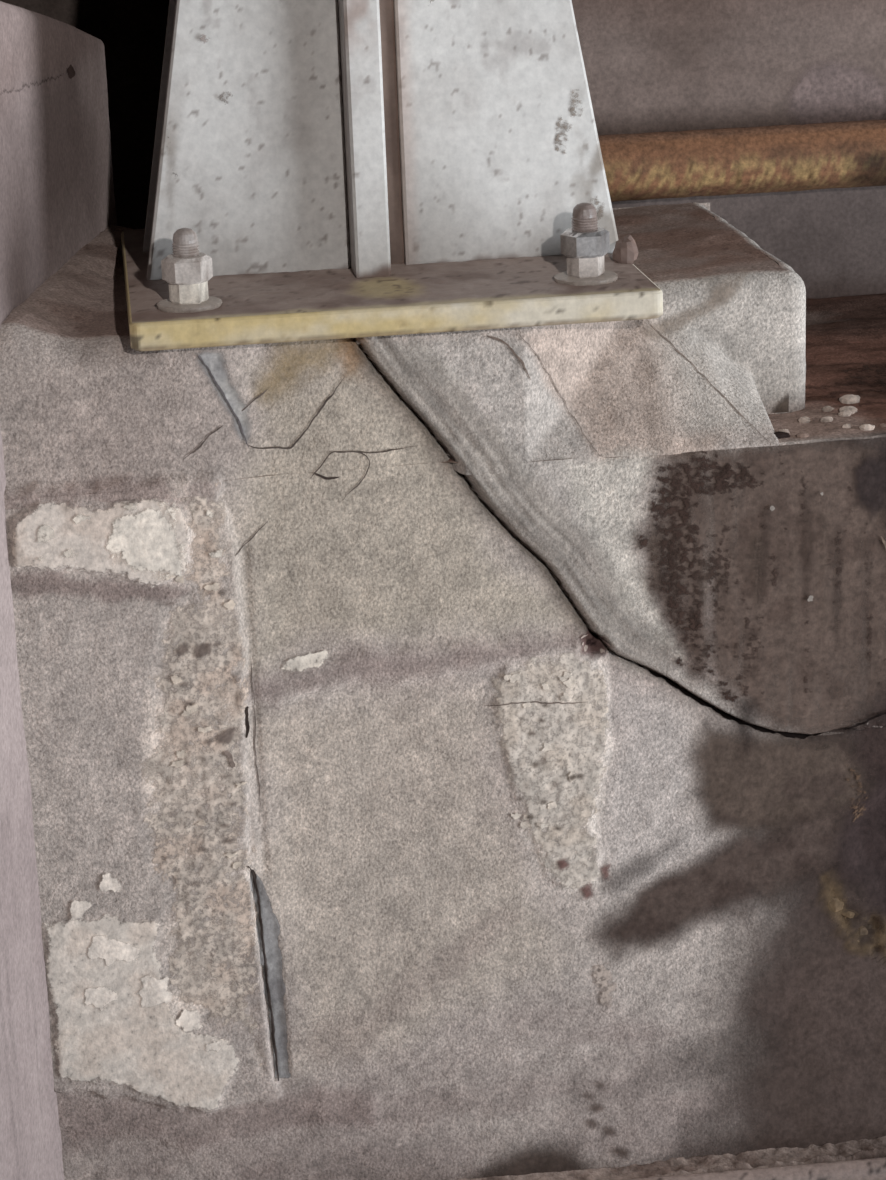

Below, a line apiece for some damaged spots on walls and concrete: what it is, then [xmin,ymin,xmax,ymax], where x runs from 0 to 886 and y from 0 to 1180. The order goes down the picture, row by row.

crack [184,353,344,459]
crack [311,322,886,739]
spalling [11,484,259,1110]
crack [245,664,261,816]
leakage [601,437,886,1155]